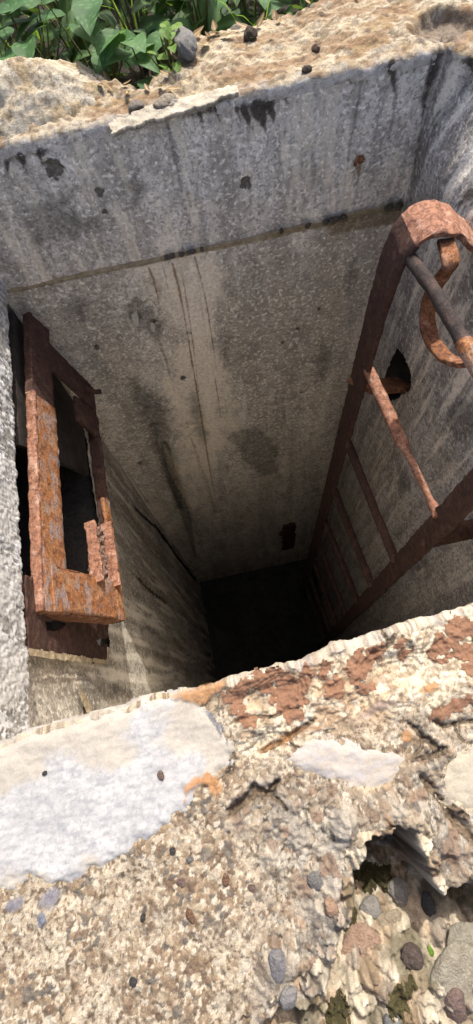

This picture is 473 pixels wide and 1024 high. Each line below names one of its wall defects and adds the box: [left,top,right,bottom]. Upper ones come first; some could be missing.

damp [4,148,50,172]
damp [229,98,275,133]
hole [385,349,412,402]
peeling [221,611,473,728]
crack [221,707,315,815]
spalling [242,822,473,1024]